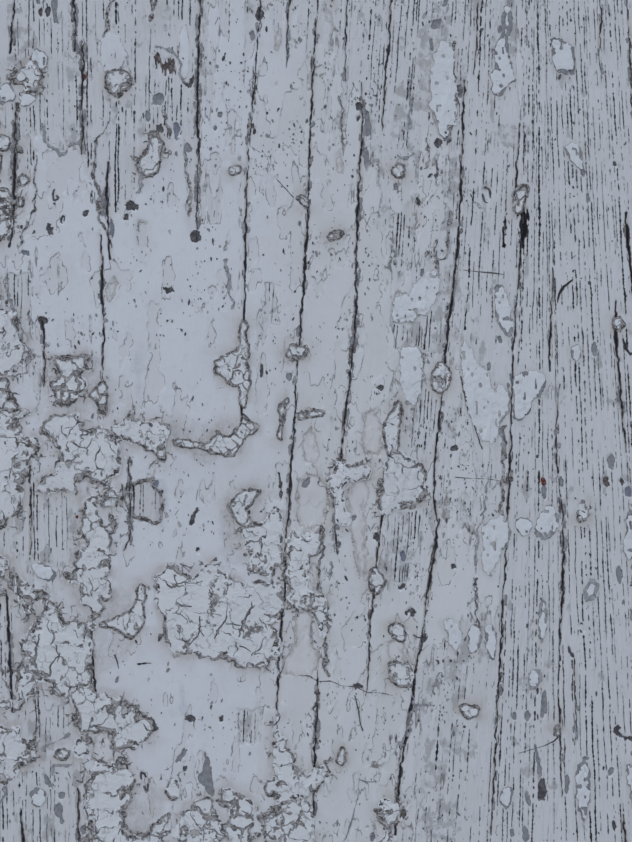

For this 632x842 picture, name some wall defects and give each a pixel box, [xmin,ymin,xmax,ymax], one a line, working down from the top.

peeling [428,19,463,148]
crack [624,0,632,117]
peeling [0,134,24,173]
peeling [0,173,30,242]
peeling [391,268,441,323]
crack [611,212,632,453]
crack [270,0,524,841]
peeling [0,276,548,842]
peeling [481,485,559,576]